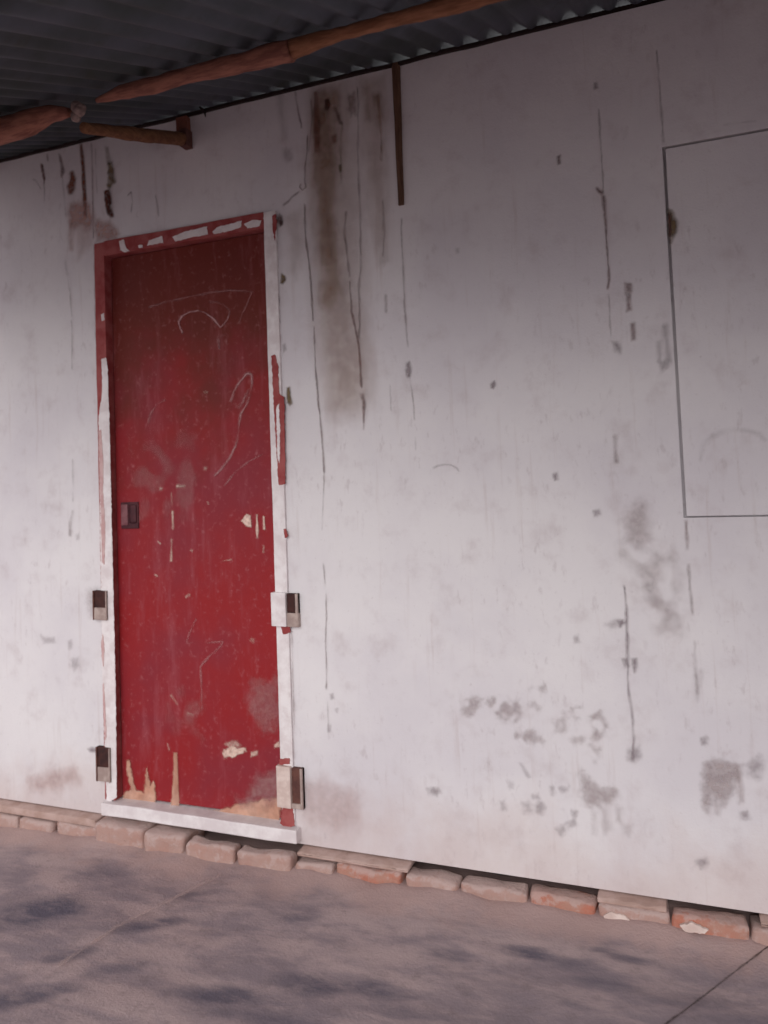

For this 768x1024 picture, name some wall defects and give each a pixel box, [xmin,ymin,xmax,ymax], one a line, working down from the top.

damp [314,92,341,292]
crack [619,587,636,692]